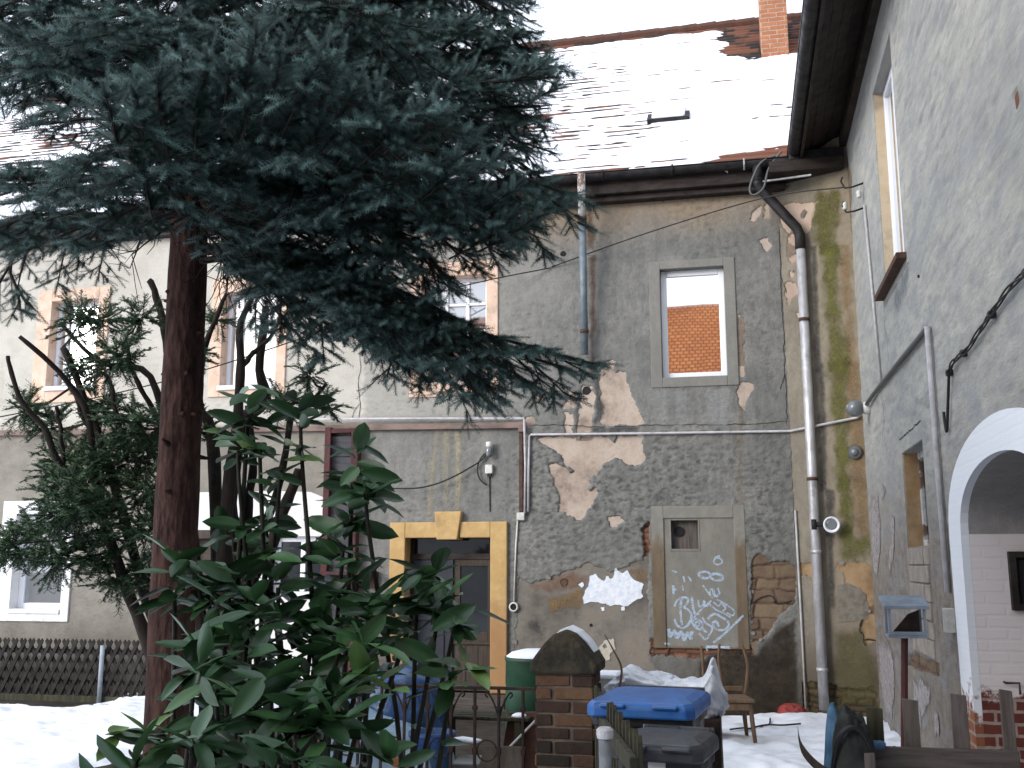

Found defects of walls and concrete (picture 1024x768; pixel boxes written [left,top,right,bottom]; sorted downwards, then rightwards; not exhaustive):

flaking render [750,201,818,318]
flaking render [538,360,646,520]
flaking render [737,314,754,411]
water stain [812,191,870,606]
flaking render [608,516,624,527]
flaking render [511,522,813,671]
flaking render [802,482,895,720]
peeling [909,654,940,738]